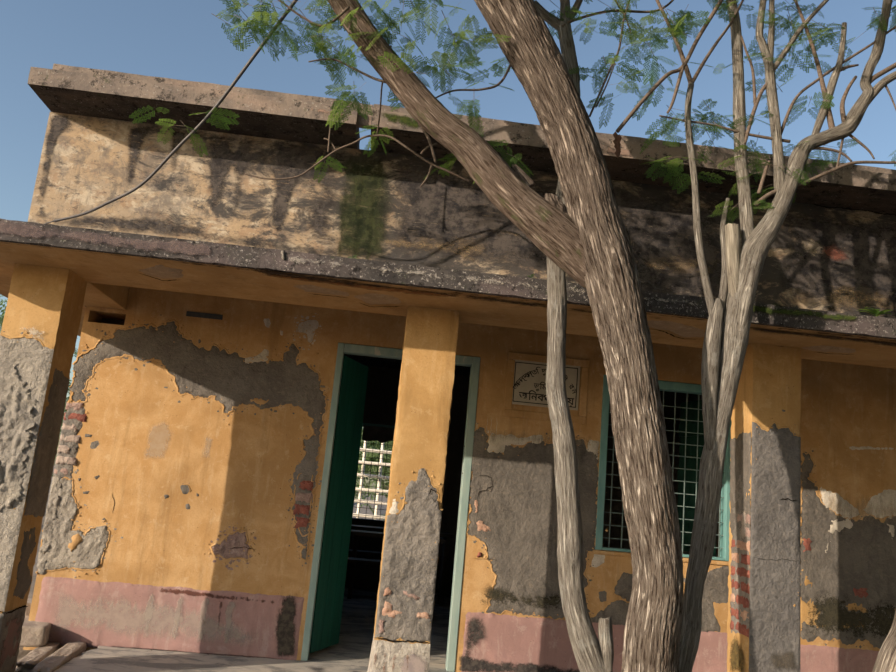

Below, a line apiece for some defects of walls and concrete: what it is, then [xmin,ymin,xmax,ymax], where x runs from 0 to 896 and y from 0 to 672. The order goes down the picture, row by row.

water stain [39,116,70,196]
water stain [69,217,208,238]
water stain [204,136,344,237]
water stain [621,194,721,298]
peeling [0,311,331,669]
peeling [375,468,443,644]
peeling [462,423,565,621]
peeling [575,431,633,625]
peeling [701,418,896,672]
water stain [276,595,296,656]
water stain [459,619,580,672]
water stain [807,596,896,638]